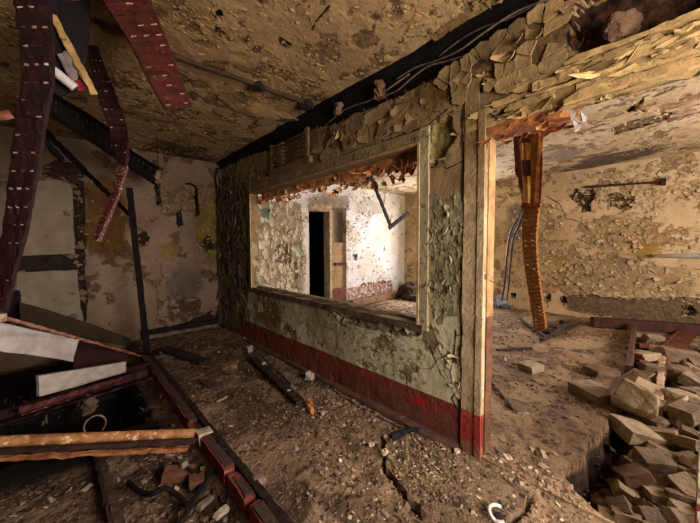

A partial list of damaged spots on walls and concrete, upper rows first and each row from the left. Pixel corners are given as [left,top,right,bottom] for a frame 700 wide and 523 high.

rust [256,158,417,205]
crack [374,103,465,202]
peeling [154,0,700,330]
crack [422,315,463,441]